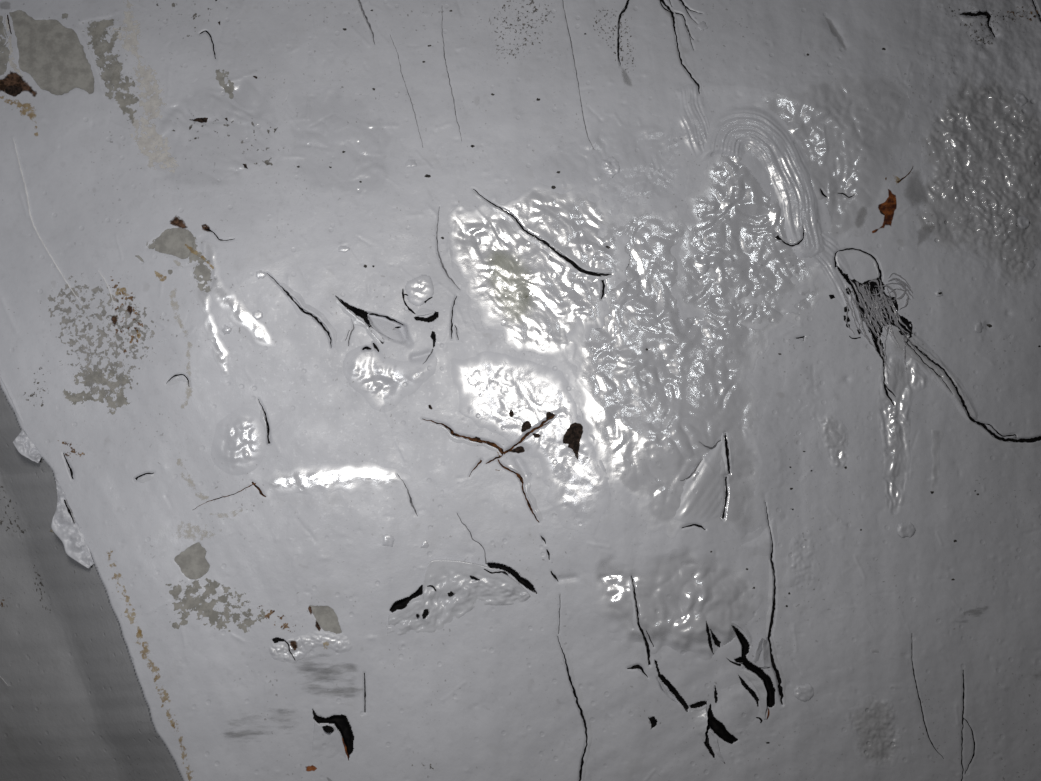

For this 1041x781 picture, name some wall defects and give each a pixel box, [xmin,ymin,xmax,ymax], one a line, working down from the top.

corrosion [0,97,38,135]
spalling [0,10,139,123]
crack [660,0,702,94]
crack [471,189,612,299]
corrosion [872,177,900,233]
peeling [40,276,161,415]
crack [849,322,1041,448]
crack [423,417,558,581]
peeling [167,542,353,664]
crack [627,576,654,677]
crack [728,502,786,723]
crack [557,608,592,781]